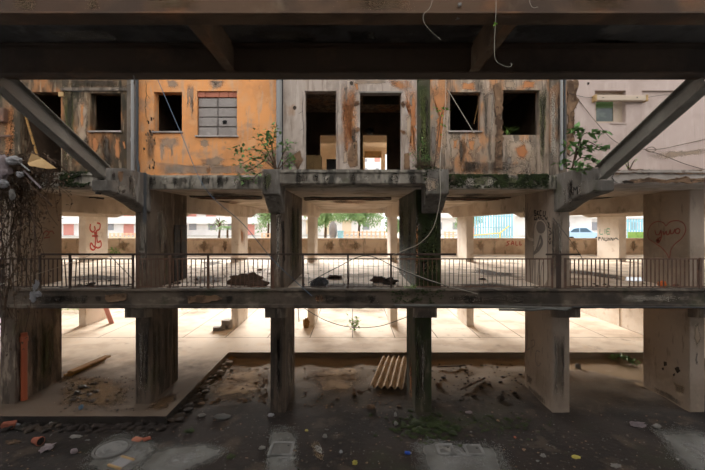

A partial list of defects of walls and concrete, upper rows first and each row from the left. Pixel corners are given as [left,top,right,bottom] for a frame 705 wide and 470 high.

peeling [143,117,156,169]
corrosion [343,100,355,151]
peeling [342,81,359,168]
peeling [400,95,416,170]
peeling [431,92,480,158]
spalling [493,81,534,170]
leakage [167,157,255,200]